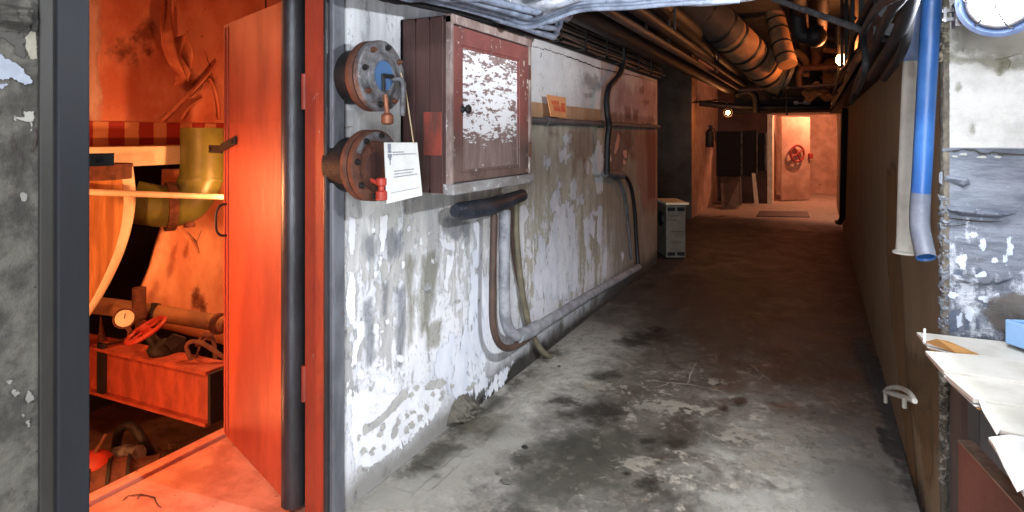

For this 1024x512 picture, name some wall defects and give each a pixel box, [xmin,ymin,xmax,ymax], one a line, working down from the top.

spalling [0,0,39,89]
peeling [14,111,34,131]
spalling [942,145,1024,159]
spalling [937,194,1014,331]
peeling [6,379,35,428]
peeling [345,215,513,474]
leakage [407,276,640,472]